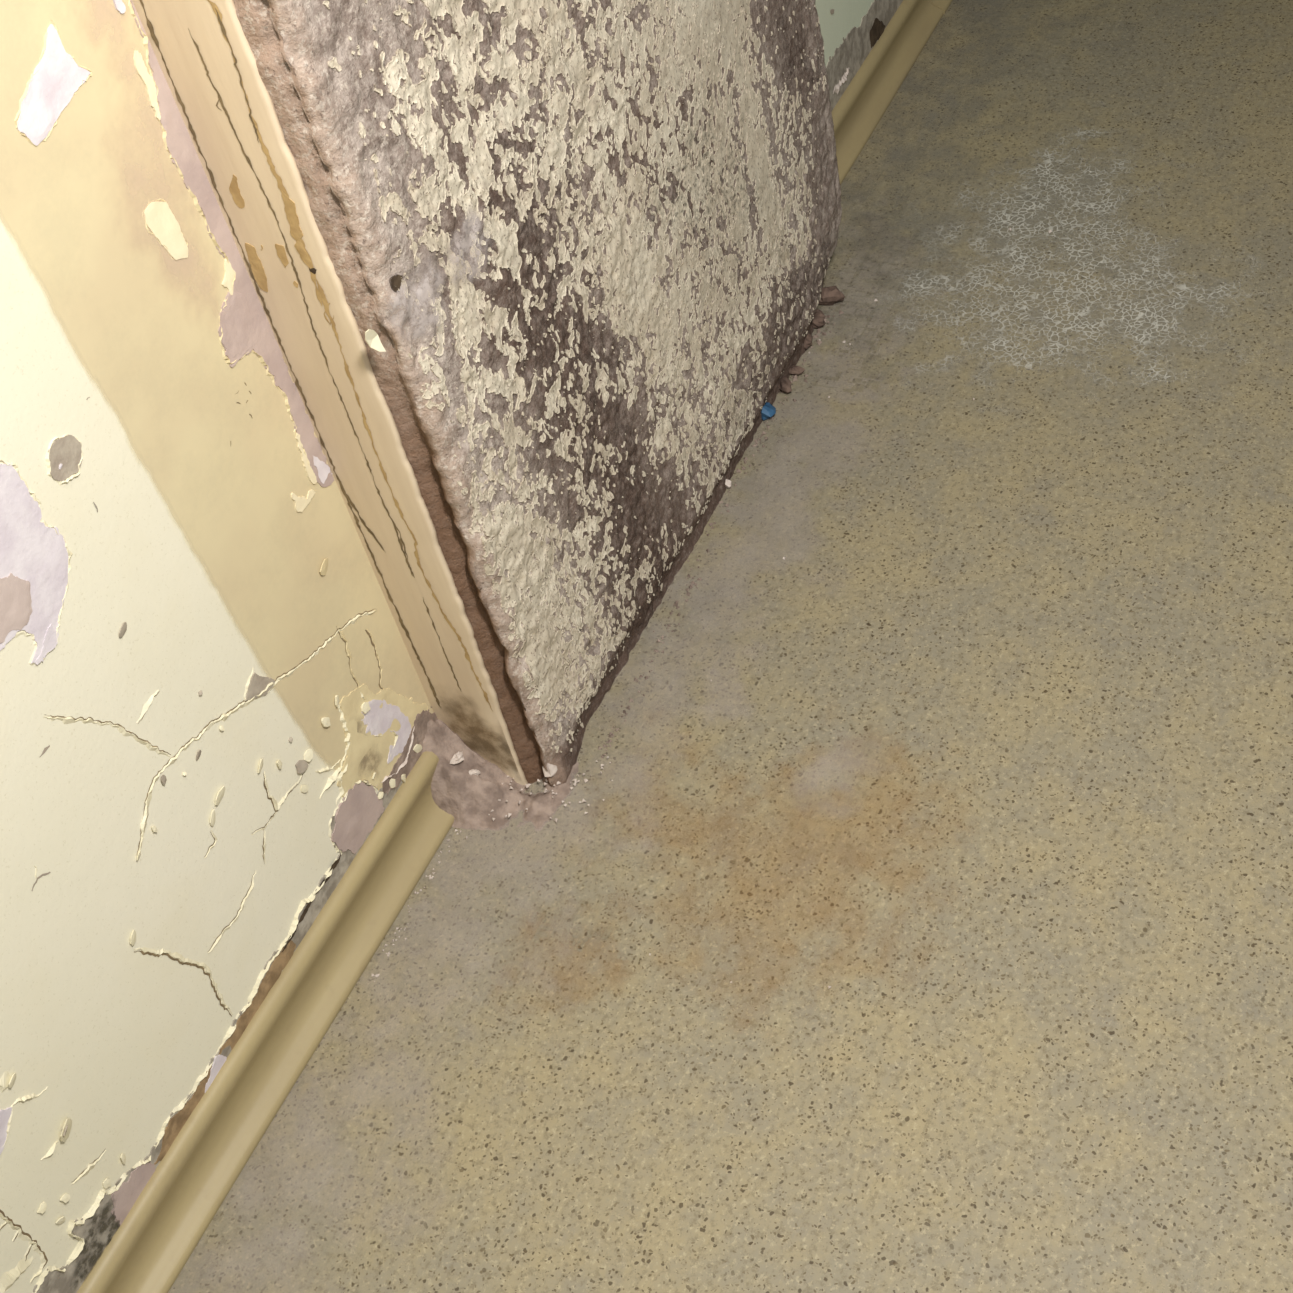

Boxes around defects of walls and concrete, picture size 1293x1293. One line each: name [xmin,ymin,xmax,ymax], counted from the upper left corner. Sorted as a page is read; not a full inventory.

peeling [14,20,92,147]
peeling [0,458,73,666]
spalling [45,434,83,485]
peeling [113,0,334,512]
crack [43,0,493,861]
damp [390,268,442,336]
damp [451,213,482,278]
peeling [328,0,903,753]
damp [452,713,518,770]
crack [134,748,313,1016]
peeling [33,684,438,1293]
peeling [0,1071,48,1155]